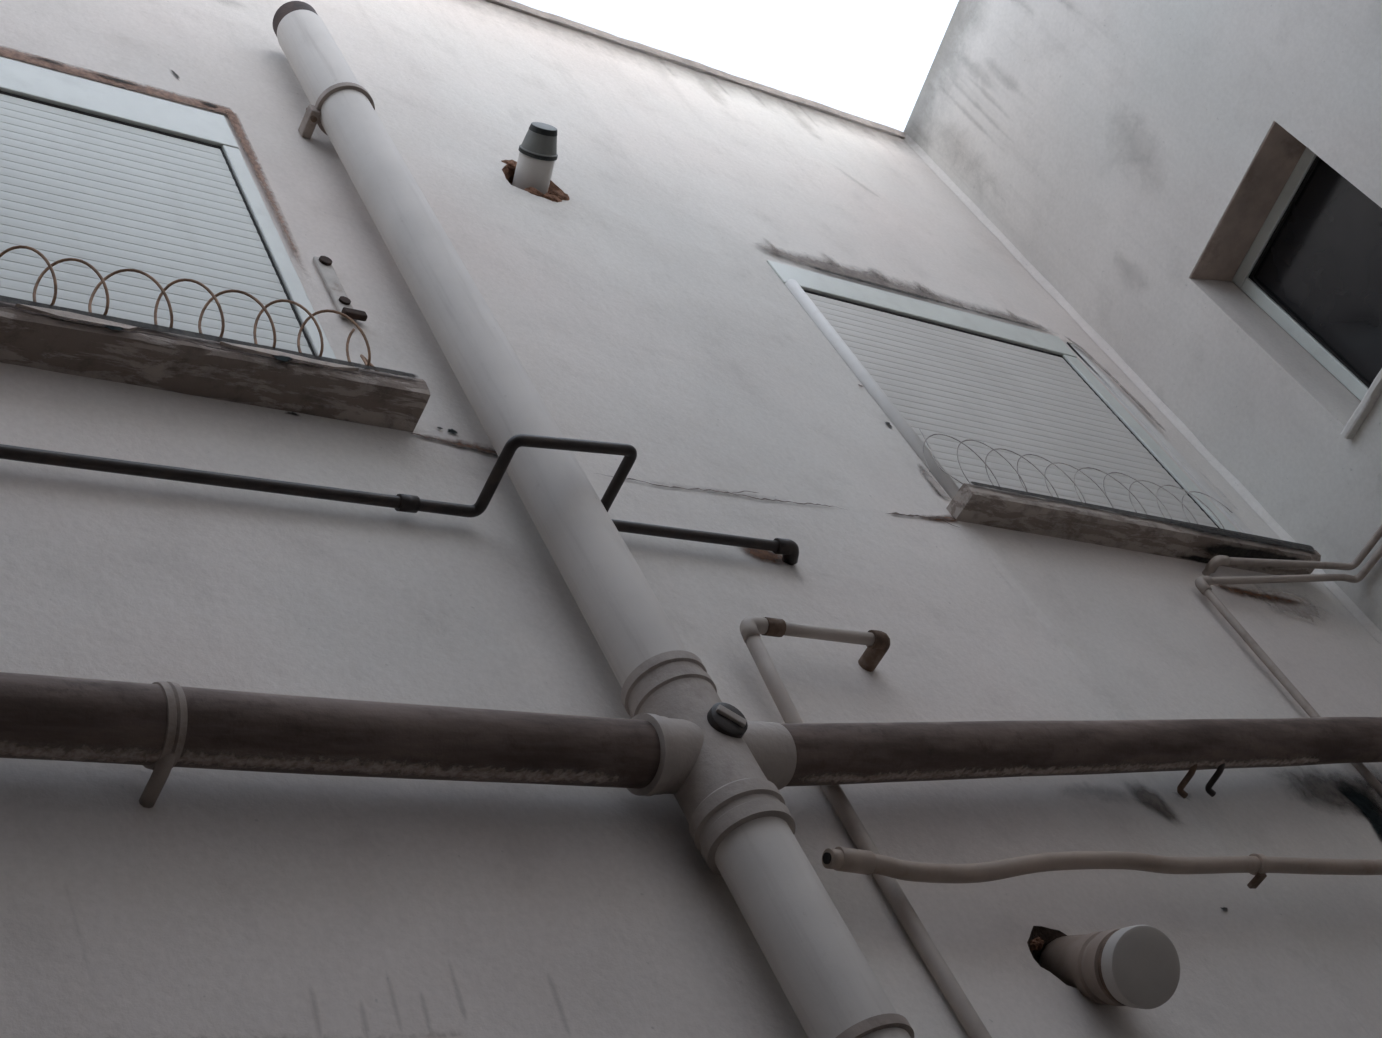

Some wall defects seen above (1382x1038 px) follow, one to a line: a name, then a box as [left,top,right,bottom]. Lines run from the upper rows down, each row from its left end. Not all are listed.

spalling [502,160,570,202]
crack [594,473,847,510]
crack [885,512,960,528]
leakage [1291,773,1382,840]